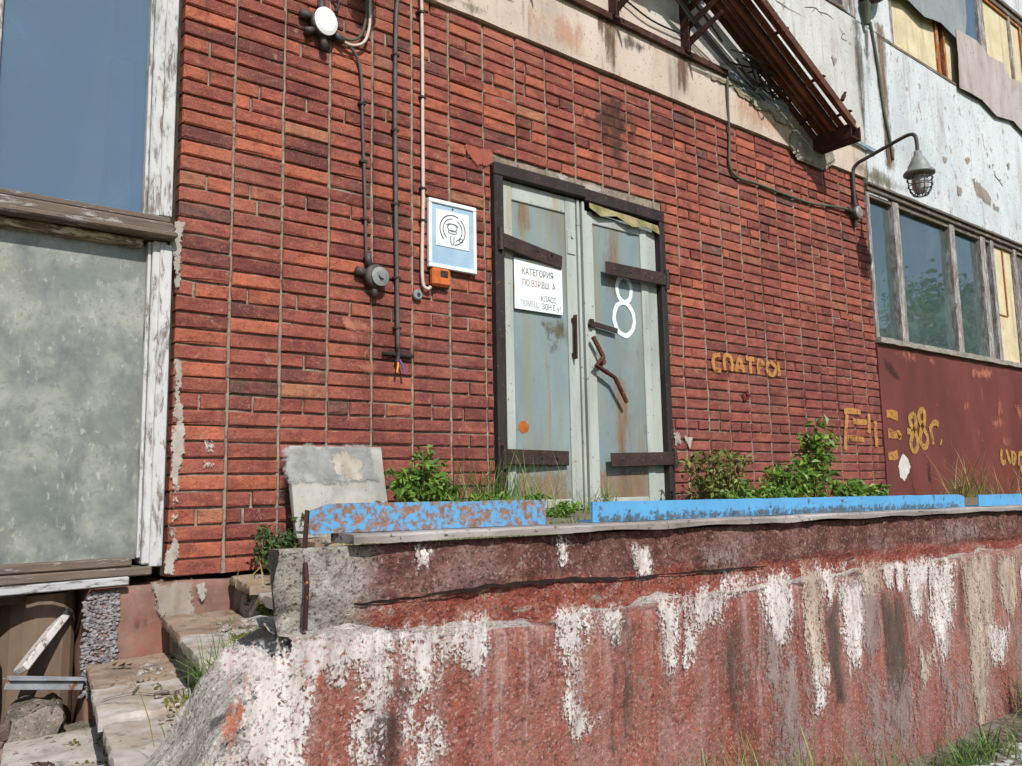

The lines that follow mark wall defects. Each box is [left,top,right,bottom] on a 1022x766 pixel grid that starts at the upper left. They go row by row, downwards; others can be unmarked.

spalling [690,65,835,170]
peeling [152,359,195,617]
water stain [215,610,495,766]
crack [353,566,766,606]
water stain [552,602,628,741]
water stain [657,541,1022,766]
water stain [944,521,978,542]